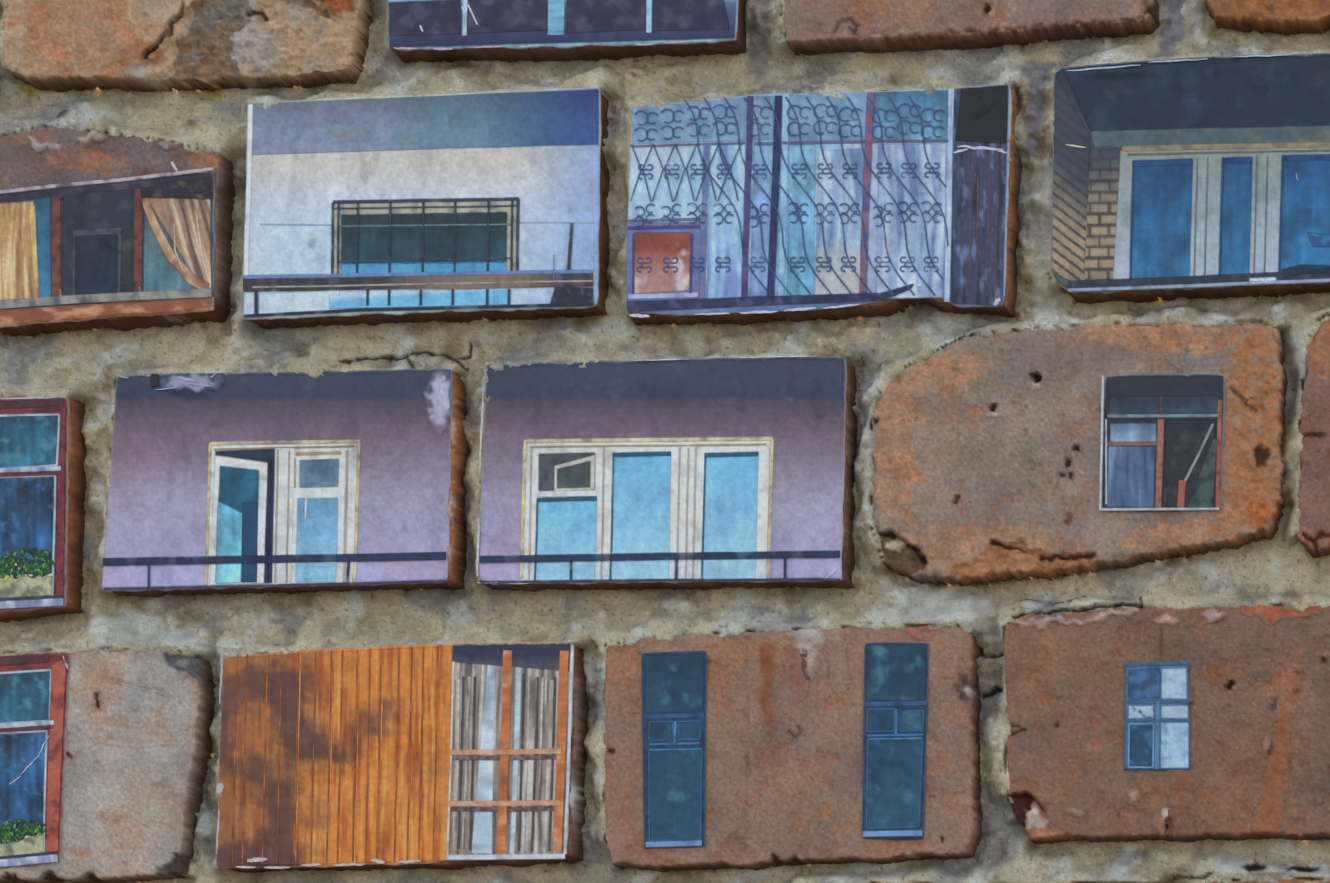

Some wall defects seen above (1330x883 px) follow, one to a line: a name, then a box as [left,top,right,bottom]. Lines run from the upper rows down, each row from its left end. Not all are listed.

spalling [148,0,373,92]
spalling [876,526,928,580]
spalling [950,537,1099,586]
spalling [1007,790,1086,843]